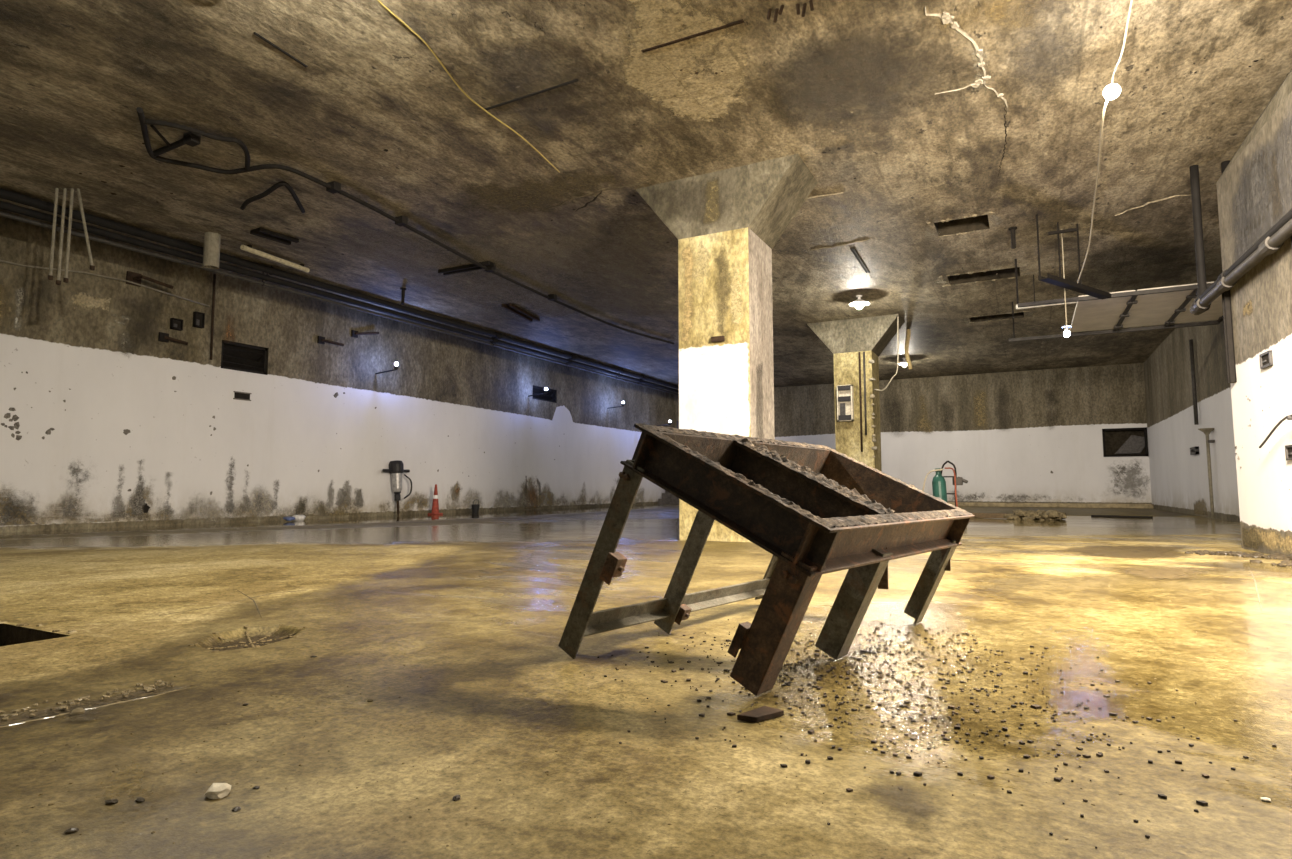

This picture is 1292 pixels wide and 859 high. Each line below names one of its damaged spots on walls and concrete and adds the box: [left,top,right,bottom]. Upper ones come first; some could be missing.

peeling [616,0,749,122]
crack [924,6,1008,176]
leakage [0,461,278,525]
leakage [291,481,363,516]
leakage [381,494,428,511]
leakage [447,488,613,510]
leakage [1113,465,1149,496]